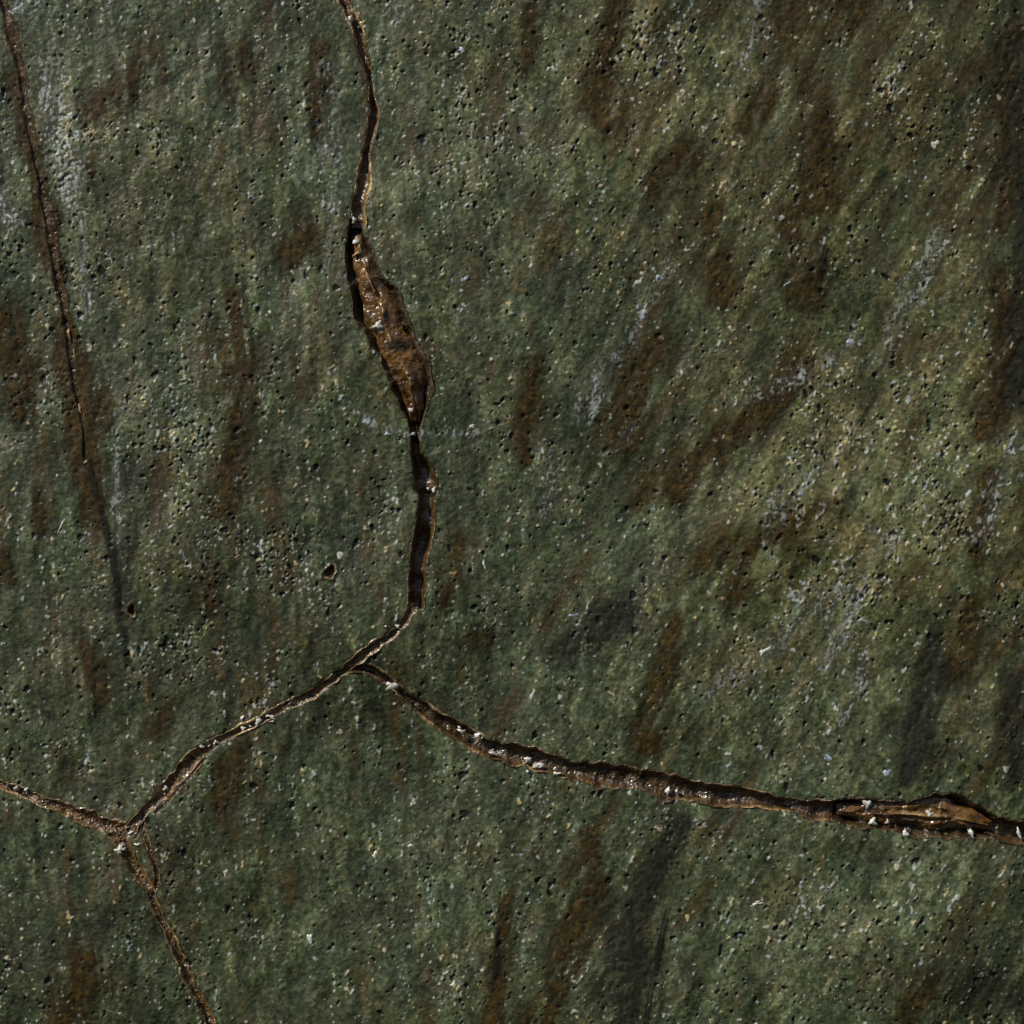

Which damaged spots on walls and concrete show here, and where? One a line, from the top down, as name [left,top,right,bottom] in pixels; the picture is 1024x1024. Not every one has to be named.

crack [0,0,128,658]
crack [336,0,380,229]
crack [0,426,835,1024]
crack [984,814,1024,845]